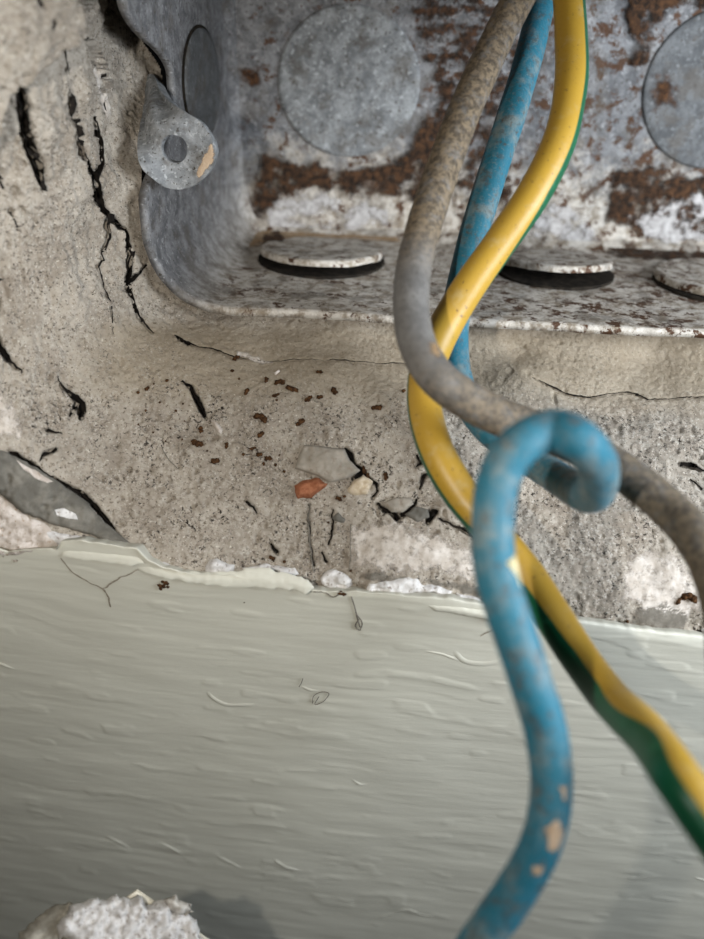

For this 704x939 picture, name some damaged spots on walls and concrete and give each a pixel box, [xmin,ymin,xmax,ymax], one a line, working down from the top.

corrosion [627,0,704,66]
crack [9,87,47,191]
crack [38,0,405,364]
corrosion [252,0,499,220]
corrosion [453,31,520,223]
corrosion [606,164,704,260]
corrosion [652,75,678,110]
crack [0,343,22,373]
peeling [0,496,353,595]
peeling [347,475,373,495]
peeling [381,497,429,522]
spalling [367,577,487,620]